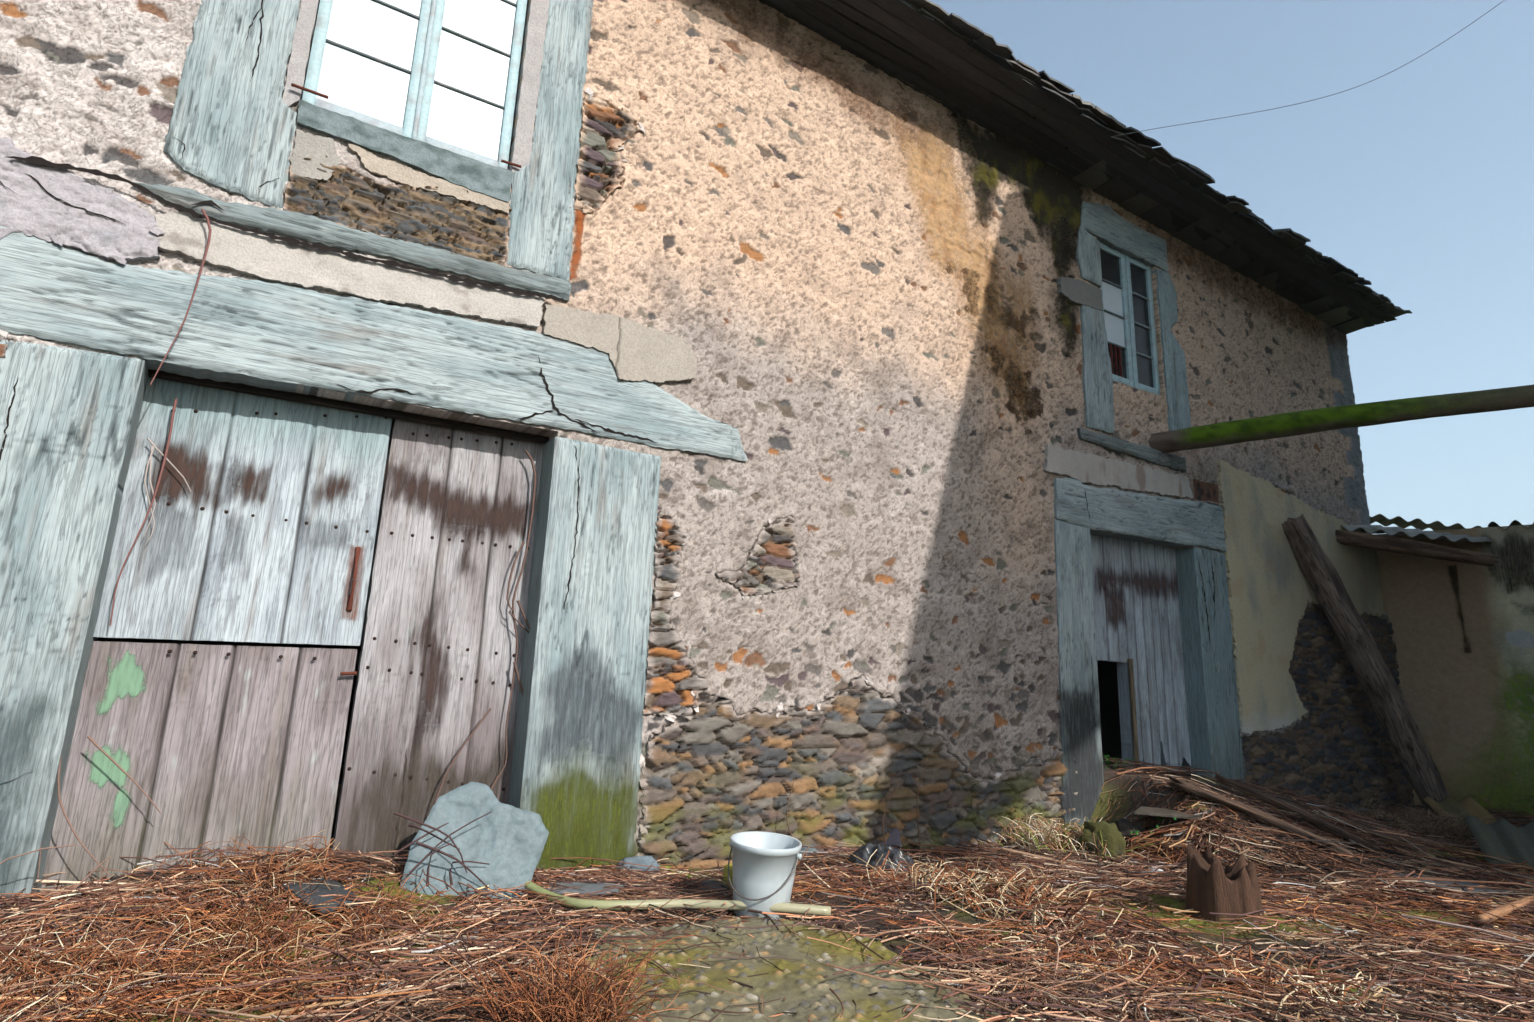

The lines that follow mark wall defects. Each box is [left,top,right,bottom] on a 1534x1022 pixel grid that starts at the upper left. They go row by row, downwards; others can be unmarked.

flaking render [283,155,512,265]
flaking render [570,87,645,215]
damp [709,0,1043,434]
flaking render [0,331,13,358]
damp [1052,234,1078,357]
damp [541,653,638,768]
flaking render [635,509,1078,872]
flaking render [1240,601,1418,814]